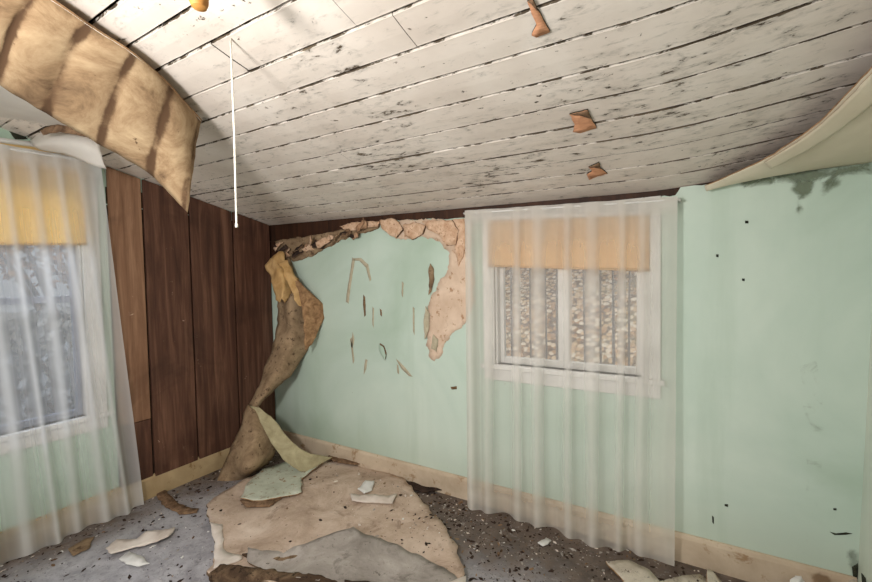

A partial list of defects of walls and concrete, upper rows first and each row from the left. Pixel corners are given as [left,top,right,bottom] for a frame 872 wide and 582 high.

peeling [527,0,550,38]
peeling [569,109,597,133]
peeling [9,124,107,169]
peeling [587,162,607,180]
leakage [741,163,870,211]
spalling [273,217,475,361]
peeling [379,343,412,377]